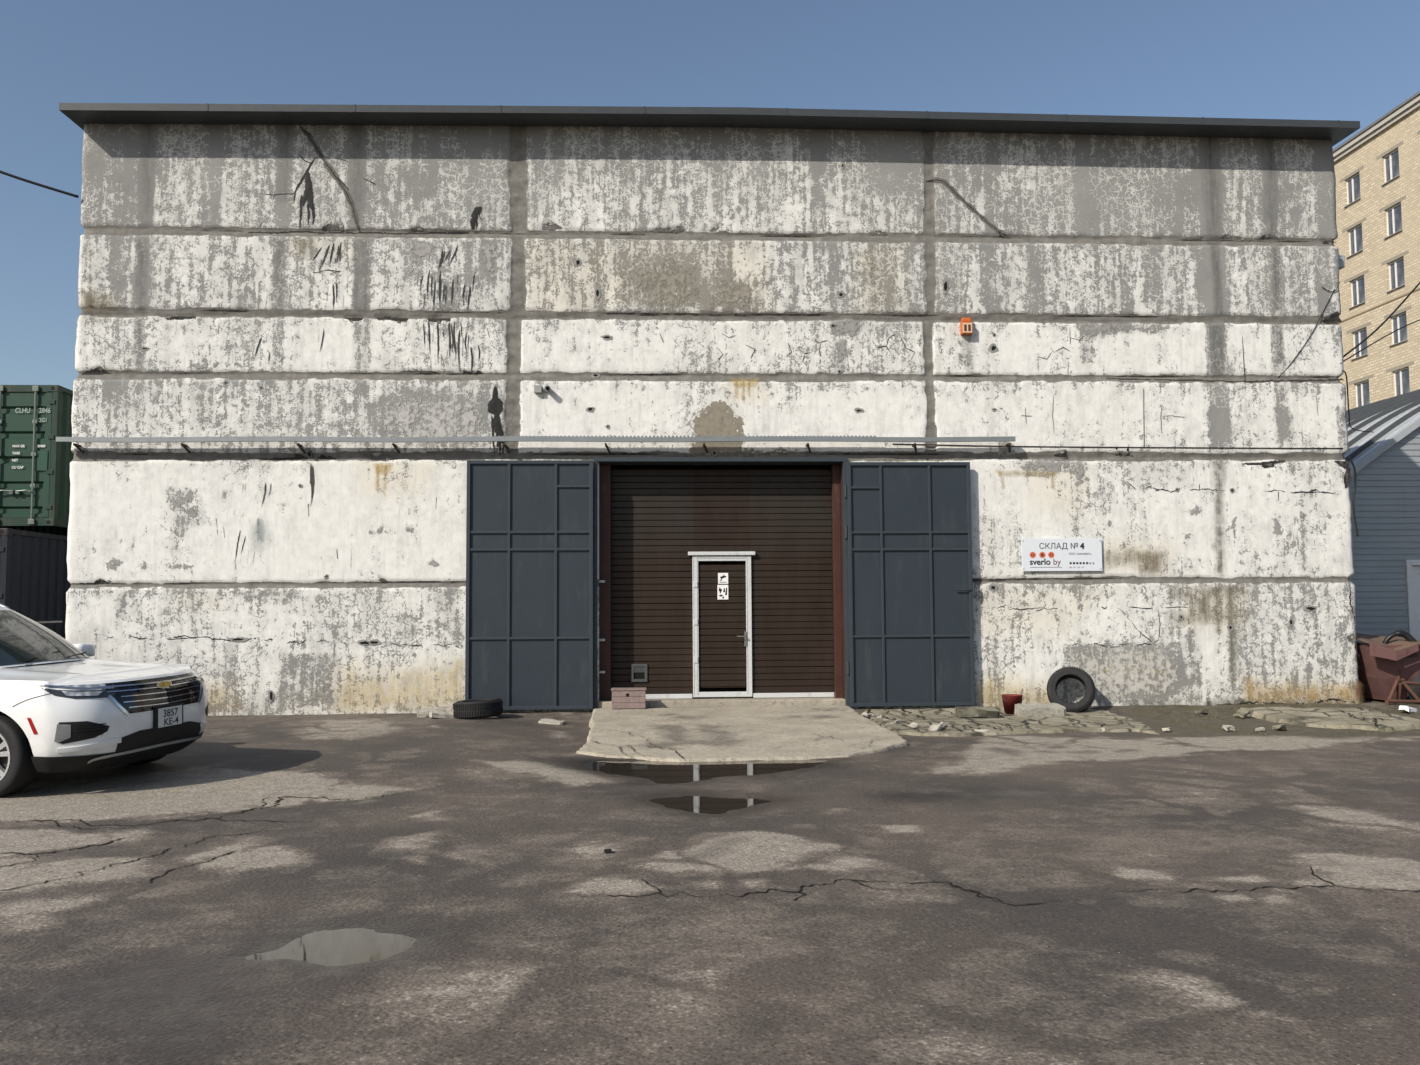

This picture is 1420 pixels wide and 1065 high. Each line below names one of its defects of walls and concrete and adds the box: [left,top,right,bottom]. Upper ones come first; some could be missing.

crack [259,125,375,232]
crack [926,177,1010,238]
peeling [248,222,469,274]
spalling [1199,234,1278,243]
spalling [1323,311,1342,324]
spalling [81,366,111,375]
peeling [381,394,485,450]
peeling [685,400,801,457]
spalling [364,451,396,462]
peeling [75,559,123,585]
peeling [1060,631,1192,704]
crack [572,866,1420,905]